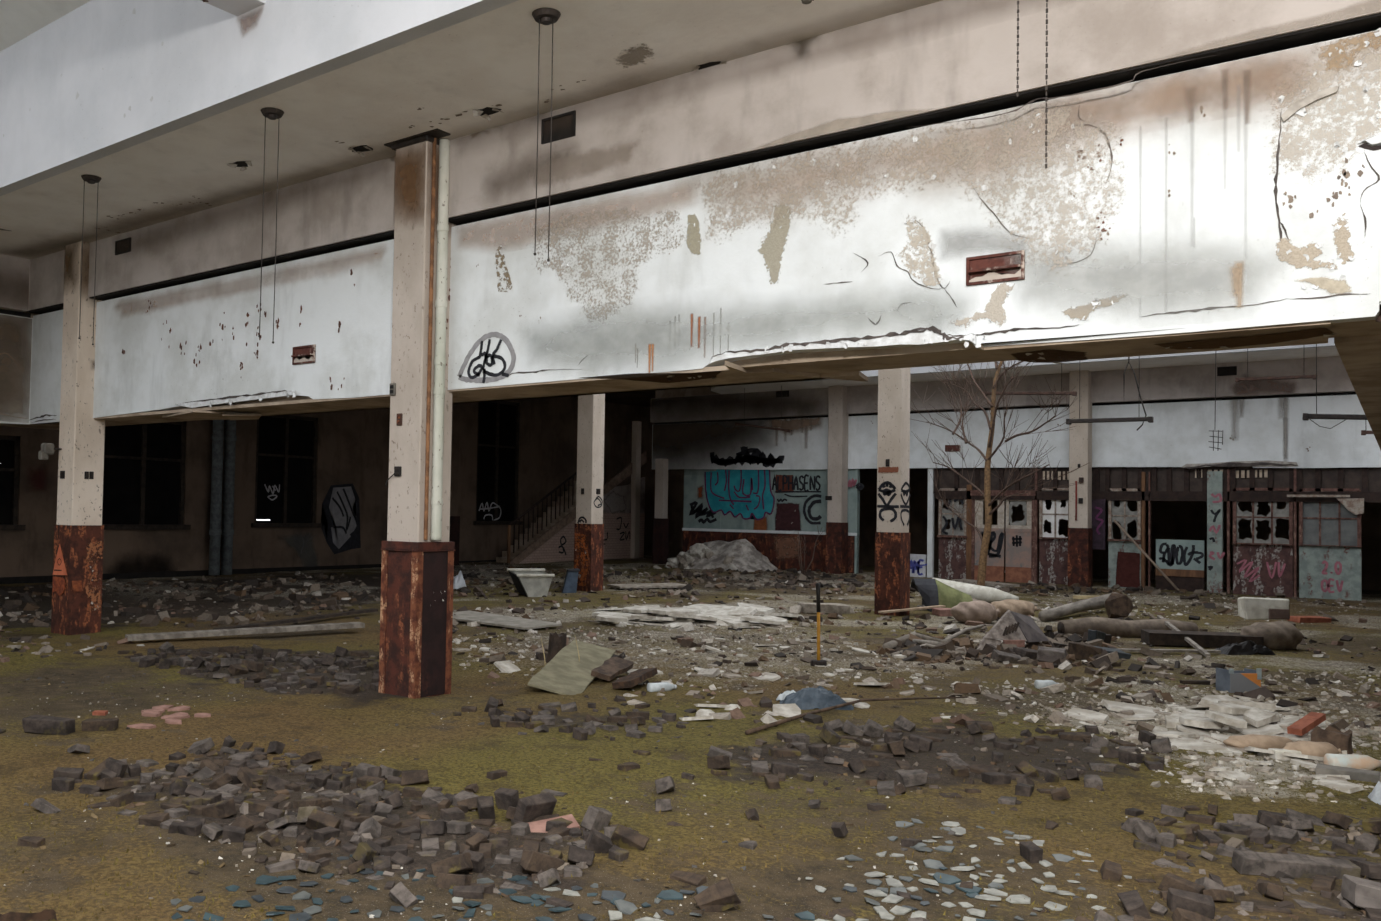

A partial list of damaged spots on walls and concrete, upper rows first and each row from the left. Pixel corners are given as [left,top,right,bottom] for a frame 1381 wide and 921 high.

peeling [536,107,1125,383]
crack [1274,110,1289,240]
peeling [1269,28,1381,294]
crack [1360,152,1380,233]
rust [85,541,103,611]